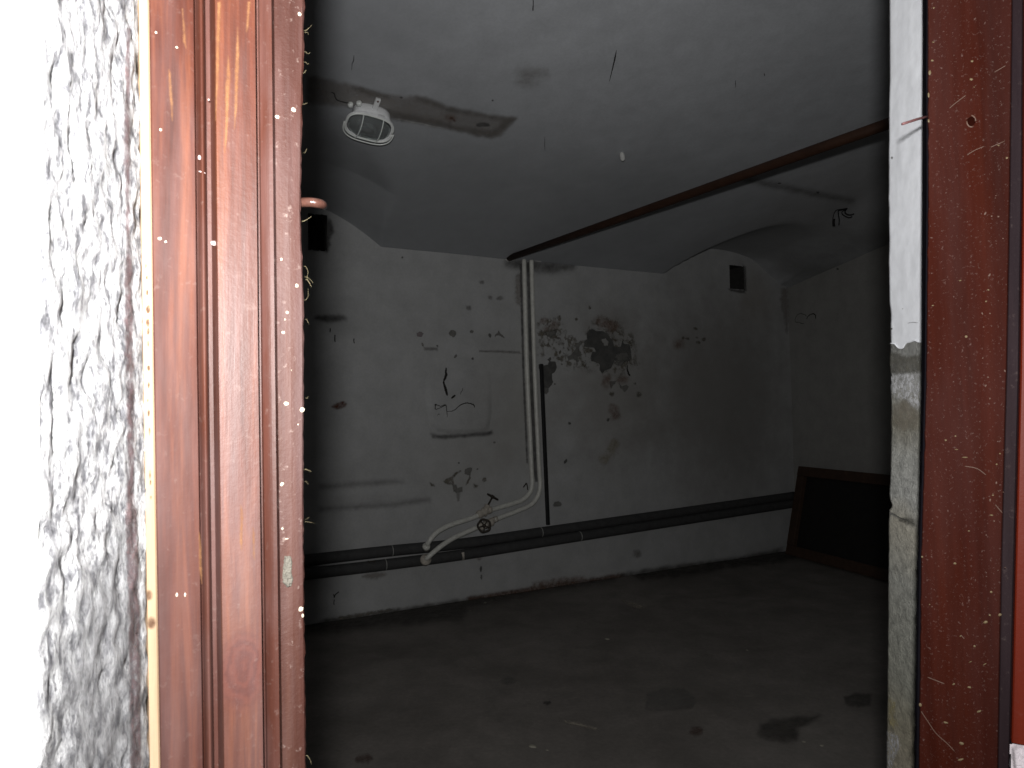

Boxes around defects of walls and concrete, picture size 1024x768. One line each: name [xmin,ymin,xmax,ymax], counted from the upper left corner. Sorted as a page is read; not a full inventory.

leakage [309,79,513,136]
peeling [538,316,641,397]